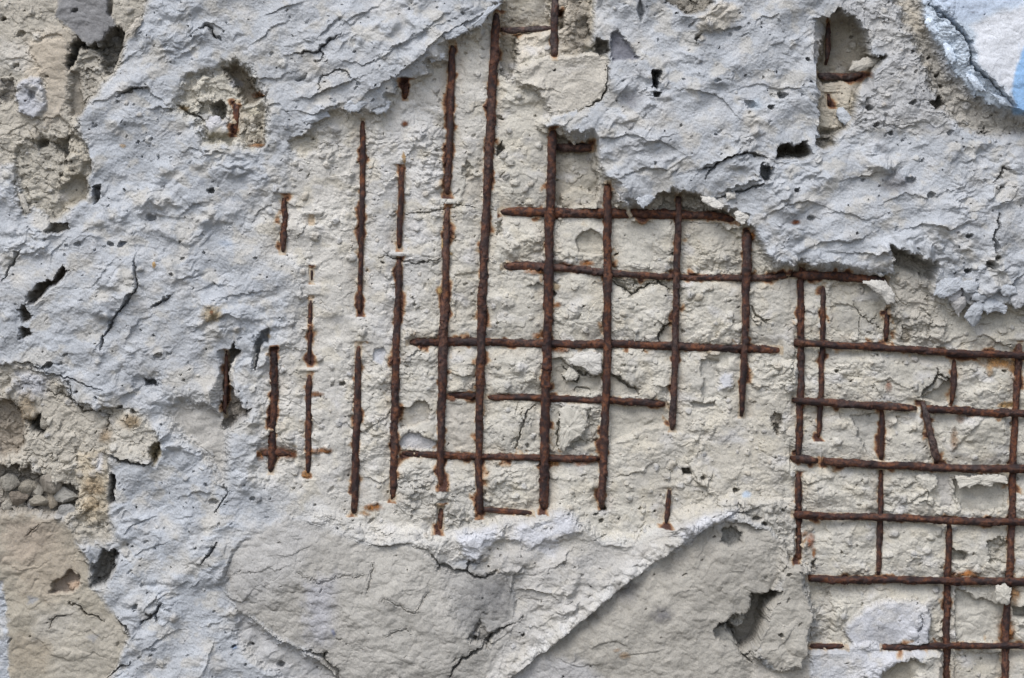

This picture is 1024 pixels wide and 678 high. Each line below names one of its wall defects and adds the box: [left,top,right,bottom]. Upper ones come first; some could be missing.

spalling [0,0,147,219]
spalling [174,62,269,150]
crack [0,249,21,282]
crack [98,260,172,352]
spalling [253,0,1024,678]
spalling [0,364,160,678]
crack [449,622,517,678]